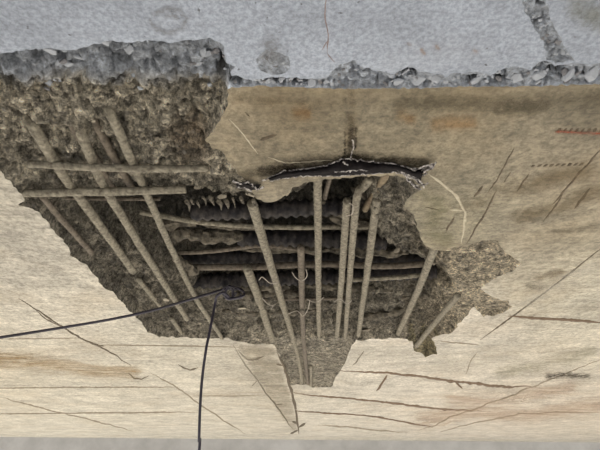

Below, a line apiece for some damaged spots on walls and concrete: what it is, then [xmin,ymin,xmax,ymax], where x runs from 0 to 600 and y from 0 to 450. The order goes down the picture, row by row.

crack [322,0,334,62]
spalling [522,0,574,64]
spalling [0,38,600,388]
leakage [258,128,428,176]
crack [466,149,529,244]
crack [543,150,600,222]
crack [1,298,245,434]
crack [233,345,600,434]